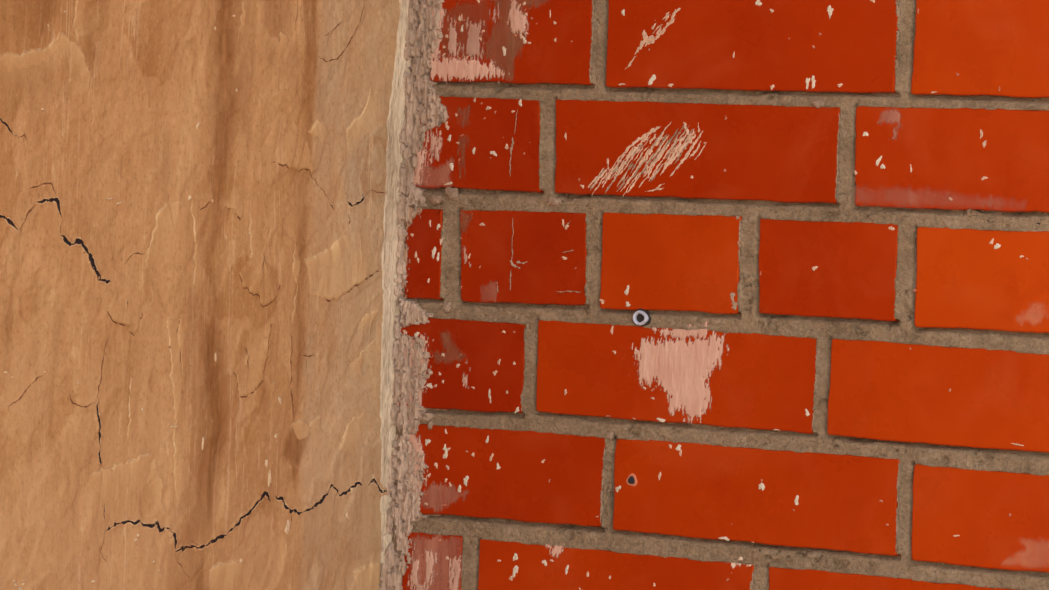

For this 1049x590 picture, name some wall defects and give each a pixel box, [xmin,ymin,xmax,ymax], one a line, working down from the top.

crack [0,180,146,287]
crack [7,374,43,408]
crack [66,332,111,470]
crack [100,475,388,579]